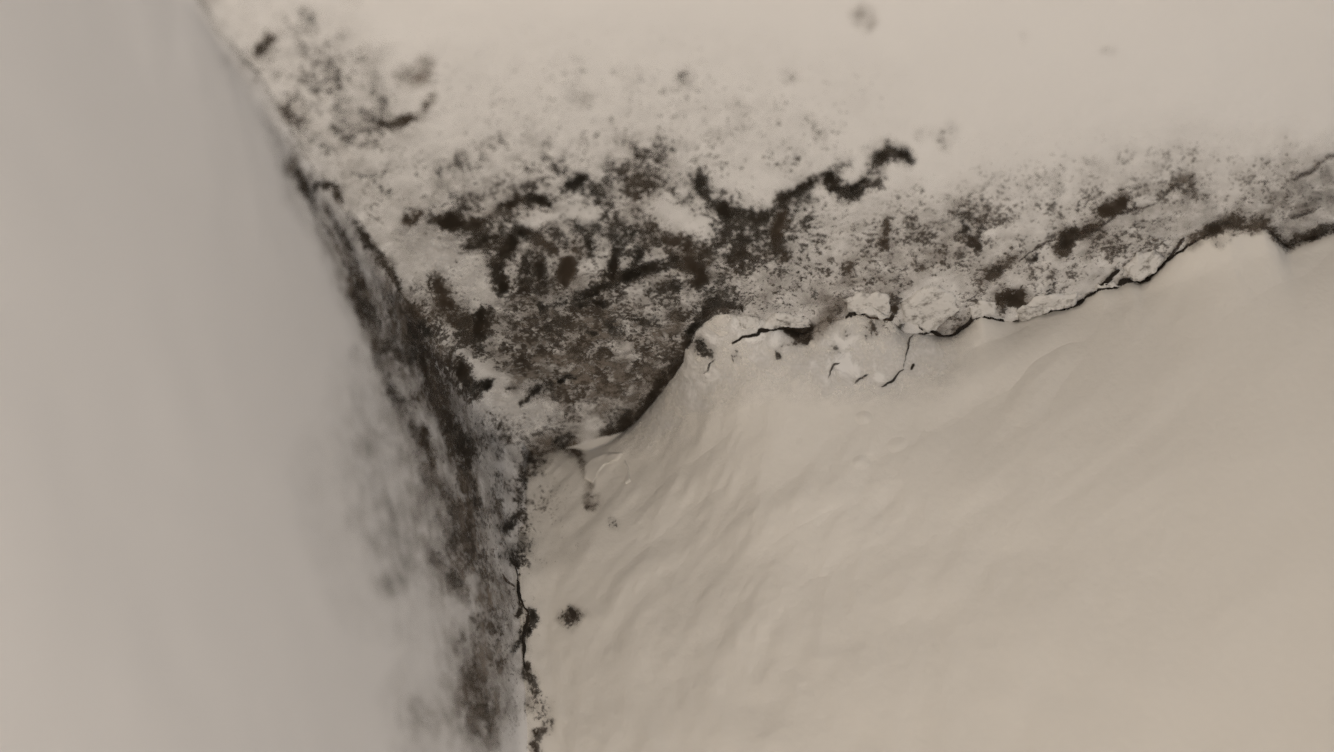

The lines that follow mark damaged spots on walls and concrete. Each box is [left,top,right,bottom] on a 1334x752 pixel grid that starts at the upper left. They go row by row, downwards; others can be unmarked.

leakage [239,30,286,82]
flaking render [1096,249,1164,288]
crack [701,302,785,374]
peeling [737,311,813,329]
flaking render [841,285,997,333]
flaking render [1016,291,1078,322]
leakage [279,8,1334,752]